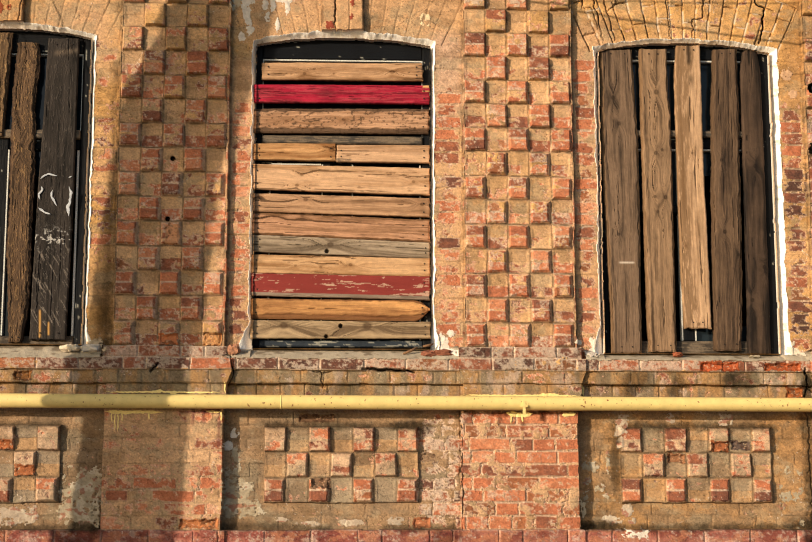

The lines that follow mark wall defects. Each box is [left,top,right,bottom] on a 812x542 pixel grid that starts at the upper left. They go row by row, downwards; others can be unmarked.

peeling [228,0,295,43]
crack [582,0,616,40]
crack [754,0,772,44]
peeling [0,505,39,528]
peeling [56,462,103,528]